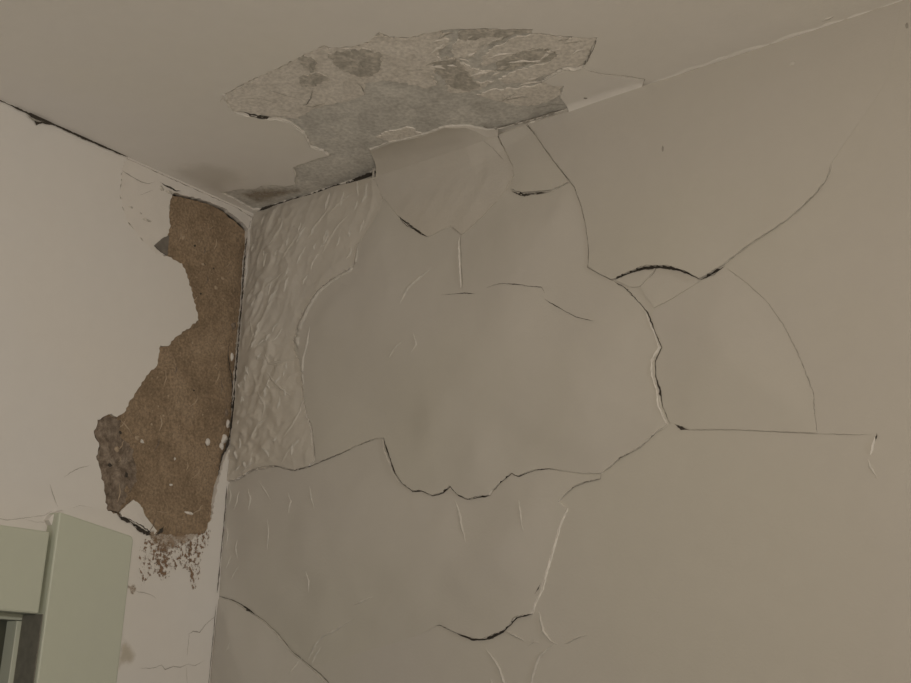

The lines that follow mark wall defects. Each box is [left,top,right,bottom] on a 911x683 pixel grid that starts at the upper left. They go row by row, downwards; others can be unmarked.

crack [0,100,127,157]
spalling [94,159,251,536]
crack [142,227,555,682]
crack [400,217,426,236]
peeling [220,2,908,666]
crack [512,124,866,497]